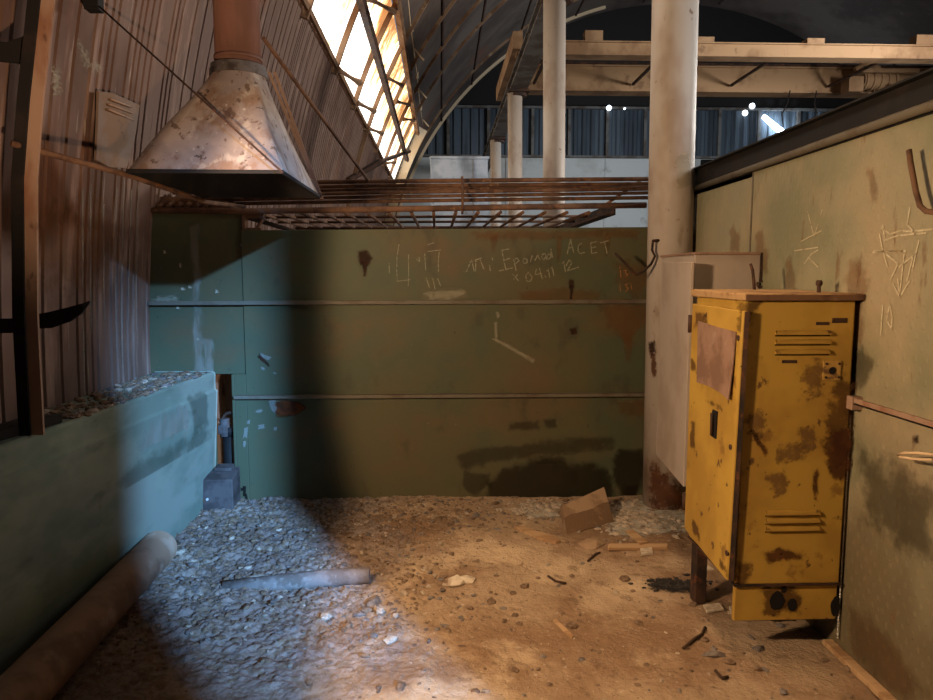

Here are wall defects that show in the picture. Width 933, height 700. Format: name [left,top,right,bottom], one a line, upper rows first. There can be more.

corrosion [358,250,372,276]
peeling [273,400,306,417]
damp [489,450,643,519]
corrosion [649,465,685,510]